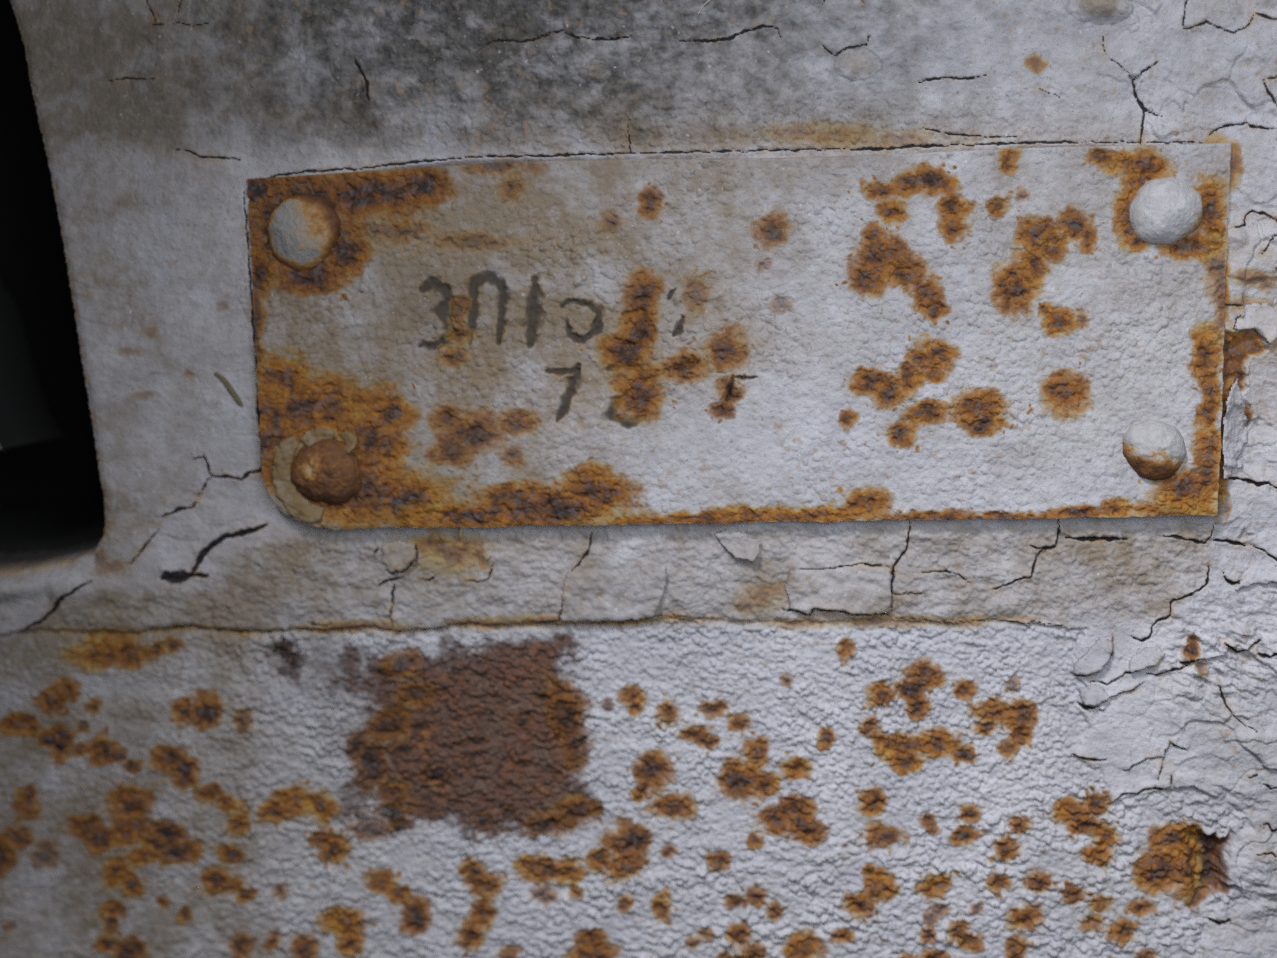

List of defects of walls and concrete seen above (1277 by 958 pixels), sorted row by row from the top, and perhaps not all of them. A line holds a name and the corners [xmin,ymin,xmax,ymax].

crack [128,36,1277,583]
corrosion [247,136,1272,570]
crack [782,519,1128,626]
peeling [1073,635,1113,707]
peeling [1129,646,1165,672]
crack [1074,525,1277,710]
spalling [1185,636,1199,659]
crack [1072,741,1186,803]
corrosion [1053,786,1119,873]
corrosion [783,862,899,958]
corrosion [901,870,984,958]
corrosion [919,803,1204,958]